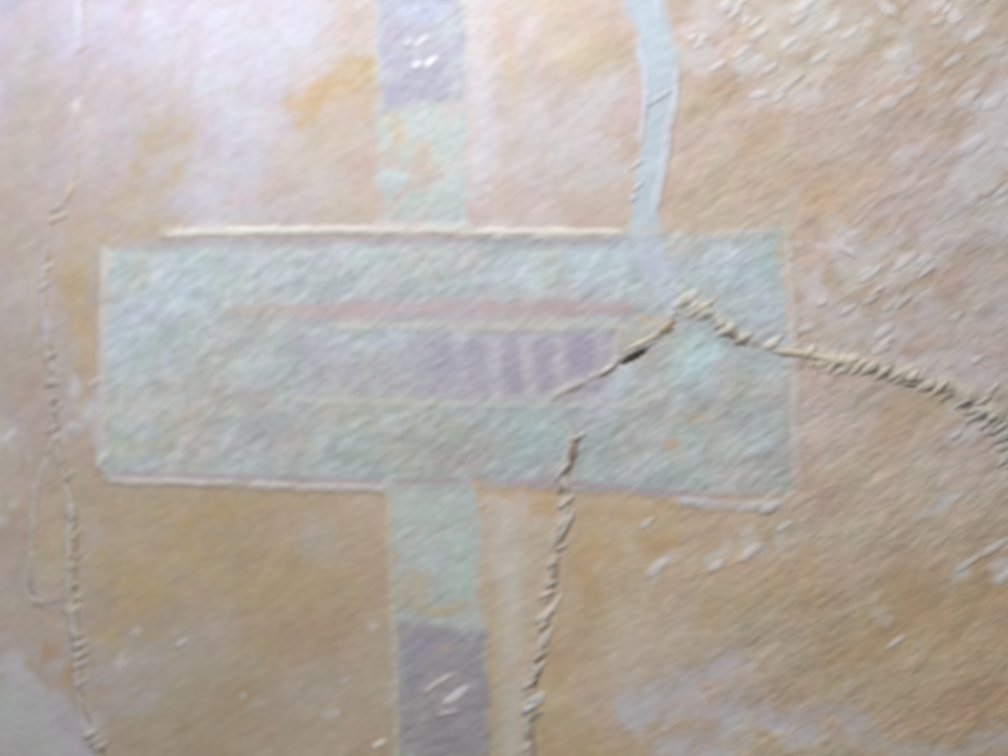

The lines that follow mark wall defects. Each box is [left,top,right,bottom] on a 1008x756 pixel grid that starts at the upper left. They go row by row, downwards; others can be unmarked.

crack [516,0,1008,756]